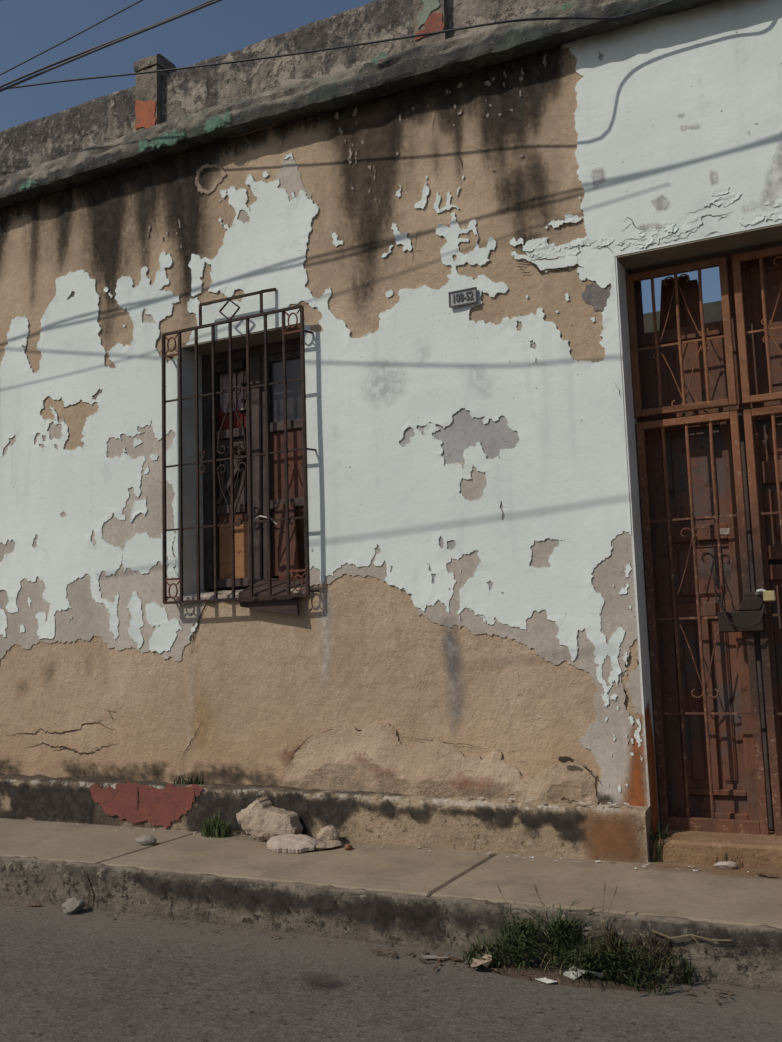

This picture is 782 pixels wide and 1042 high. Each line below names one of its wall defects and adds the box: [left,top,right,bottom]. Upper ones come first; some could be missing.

damp [0,46,560,287]
peeling [0,45,742,373]
peeling [35,389,103,450]
damp [0,779,93,823]
crack [0,709,119,754]
flaking render [0,408,648,829]